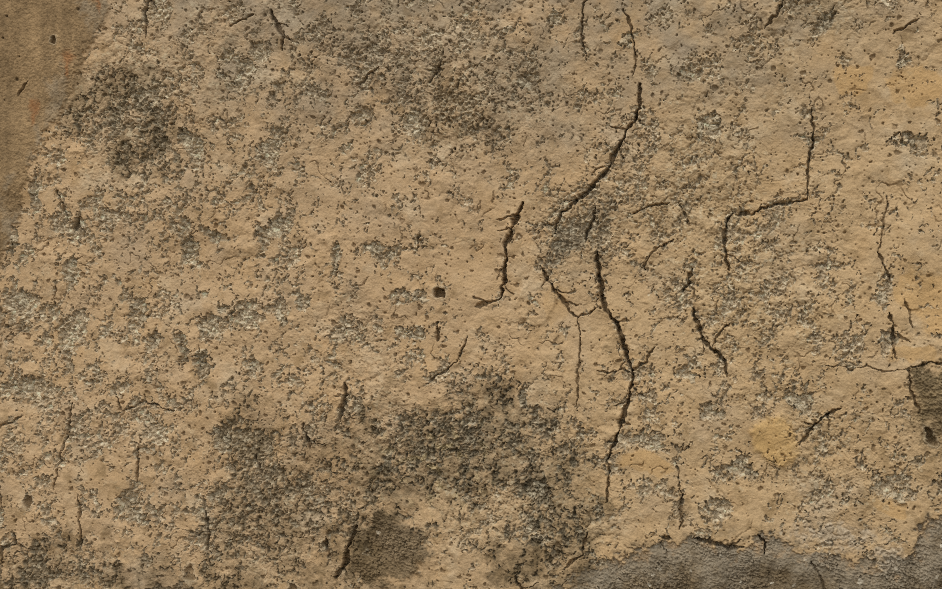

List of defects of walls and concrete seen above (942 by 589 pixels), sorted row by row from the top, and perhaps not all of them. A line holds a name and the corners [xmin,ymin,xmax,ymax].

spalling [28,169,42,214]
crack [720,108,816,271]
spalling [3,289,39,343]
spalling [58,318,79,377]
spalling [62,255,82,293]
crack [472,0,656,503]
crack [632,202,691,271]
crack [681,268,730,378]
crack [823,196,942,414]
spalling [0,370,43,403]
spalling [111,489,165,530]
crack [662,462,767,555]